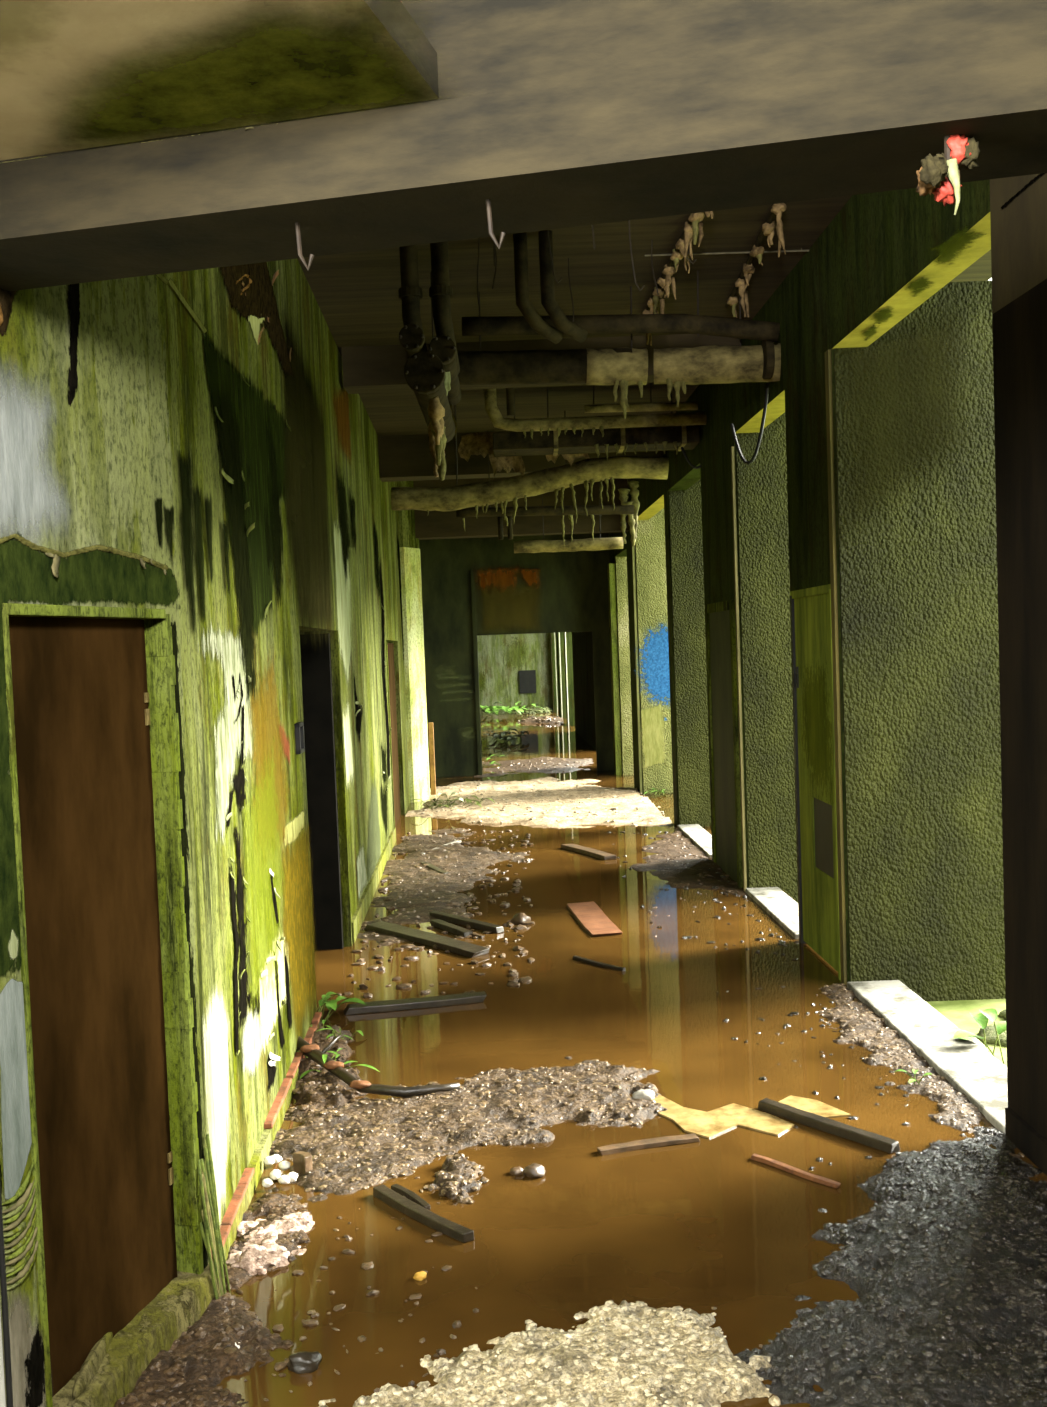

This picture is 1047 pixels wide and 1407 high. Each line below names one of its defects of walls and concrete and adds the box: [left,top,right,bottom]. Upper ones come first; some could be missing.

water stain [0,382,66,536]
water stain [155,320,380,706]
water stain [396,535,406,664]
peeling [284,810,304,846]
water stain [367,782,381,883]
water stain [8,930,18,959]
flaking render [0,531,181,1291]
water stain [281,824,318,1034]
water stain [203,993,229,1223]